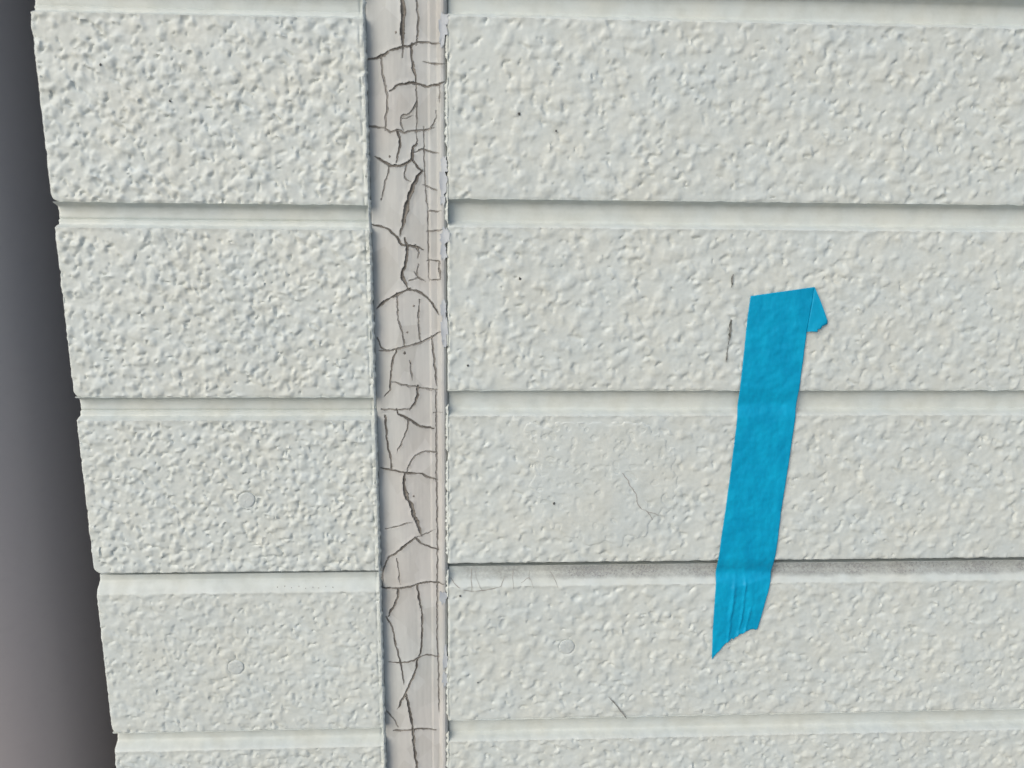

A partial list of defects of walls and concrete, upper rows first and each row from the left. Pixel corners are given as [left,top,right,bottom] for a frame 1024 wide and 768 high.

crack [368,0,558,768]